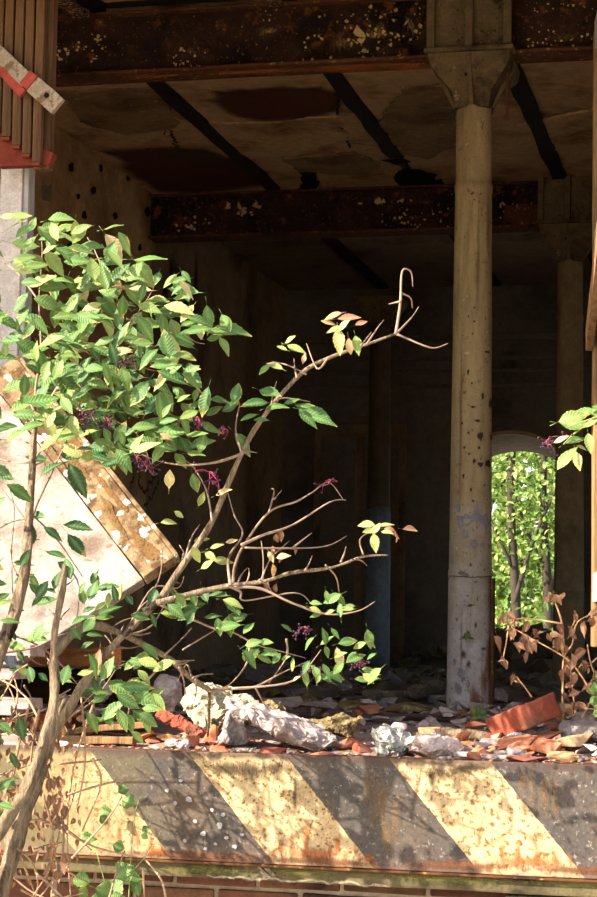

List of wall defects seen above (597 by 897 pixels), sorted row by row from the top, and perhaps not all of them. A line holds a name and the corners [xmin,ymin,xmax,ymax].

corrosion [133,835,256,861]
corrosion [269,827,379,867]
corrosion [411,847,597,874]